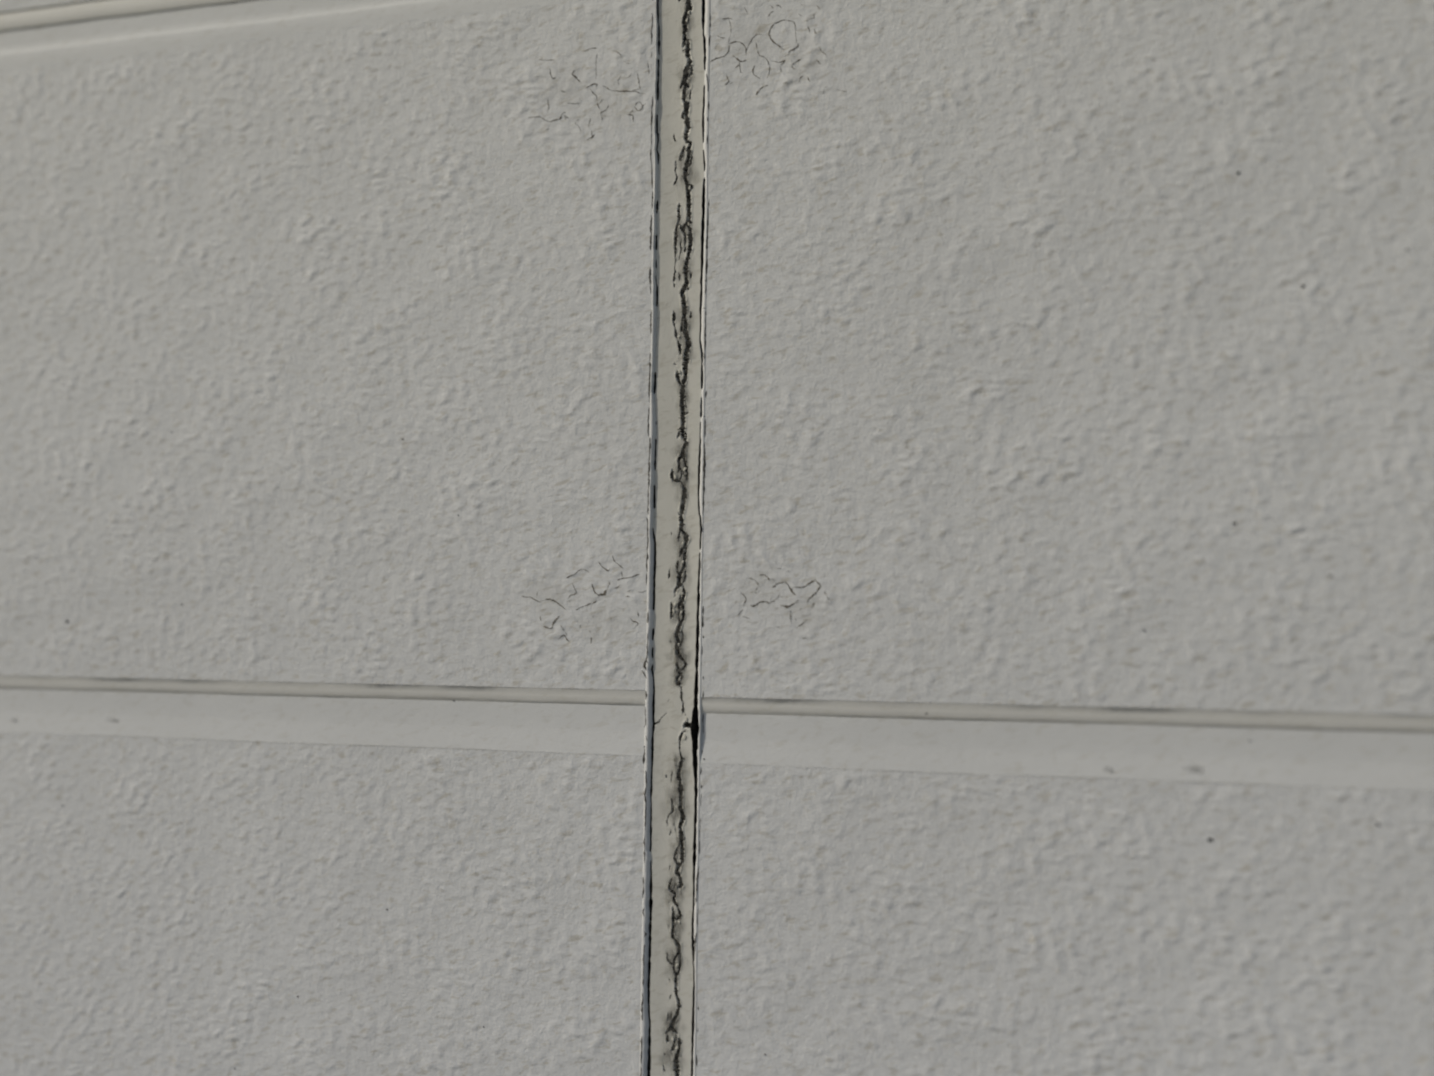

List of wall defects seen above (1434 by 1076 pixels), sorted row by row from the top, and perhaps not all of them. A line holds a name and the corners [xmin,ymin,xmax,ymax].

crack [522,0,846,1076]